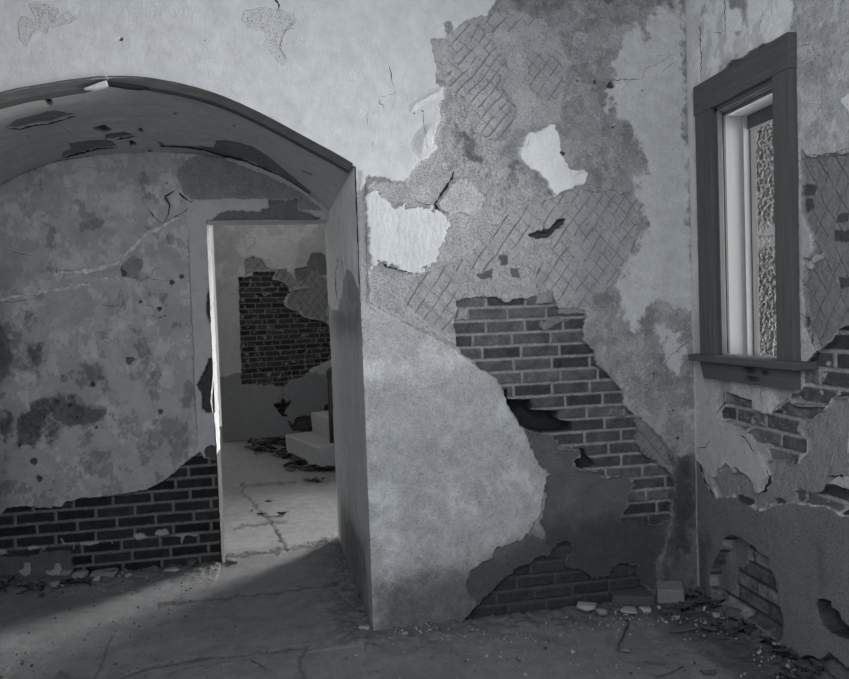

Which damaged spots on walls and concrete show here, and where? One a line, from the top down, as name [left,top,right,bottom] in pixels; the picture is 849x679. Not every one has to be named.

spalling [431,17,588,199]
crack [147,190,193,223]
peeling [158,140,359,311]
spalling [197,358,215,413]
flaking render [238,271,331,387]
flaking render [274,399,312,432]
flaking render [367,119,675,526]
flaking render [721,326,849,465]
flaking render [0,445,221,581]
flaking render [795,483,849,515]
spalling [702,535,783,646]
spalling [816,599,849,640]